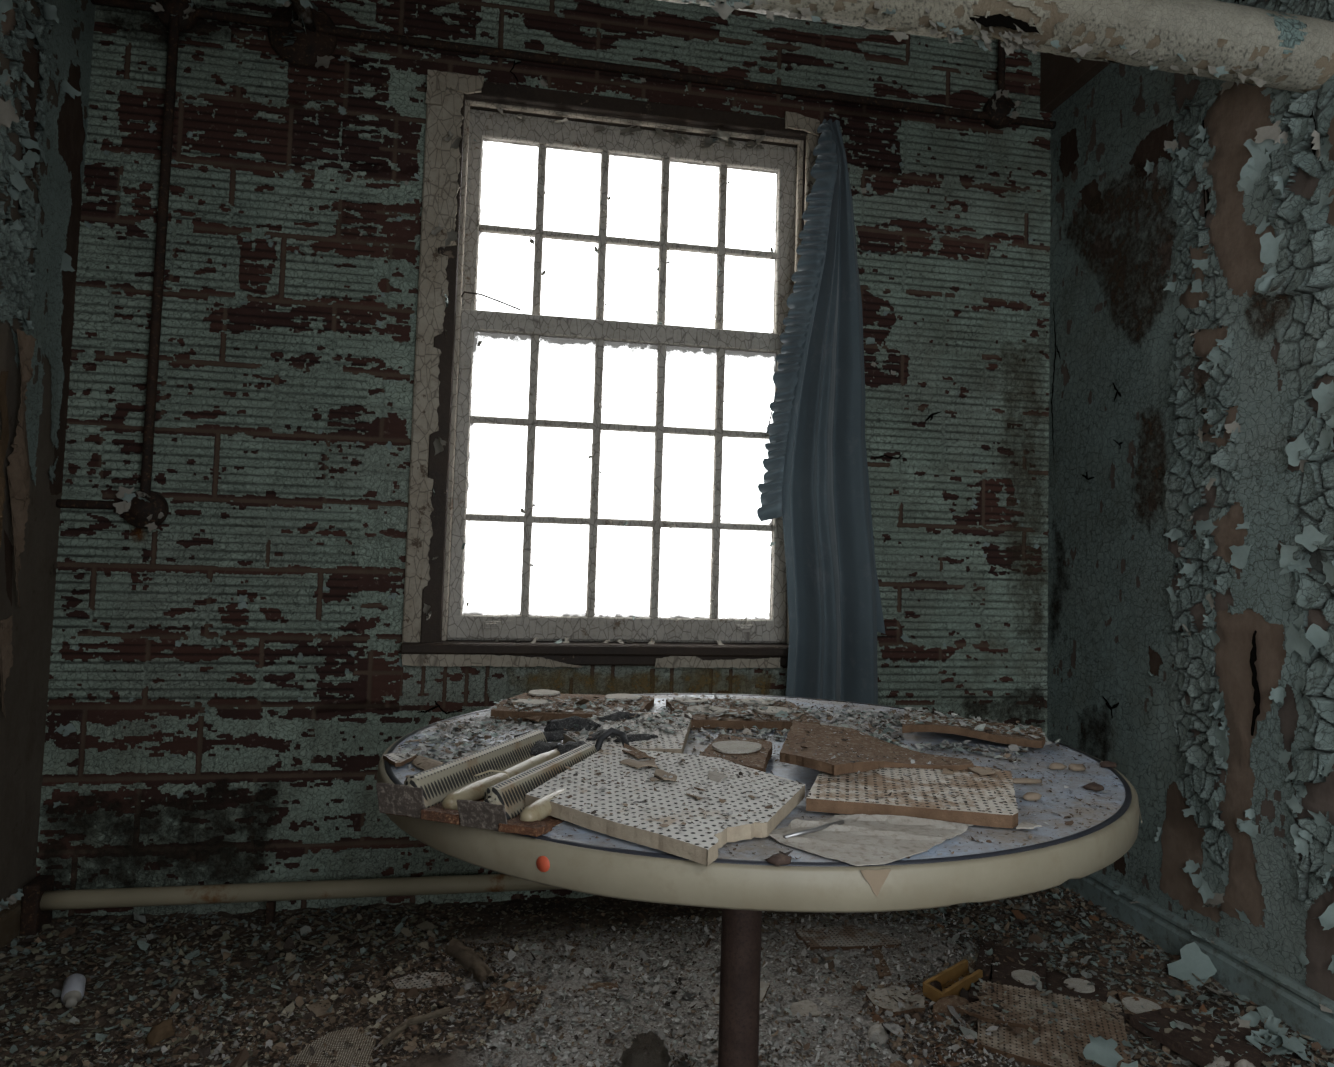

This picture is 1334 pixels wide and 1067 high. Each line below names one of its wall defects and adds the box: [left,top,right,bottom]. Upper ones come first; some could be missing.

flaking render [20,0,1033,495]
leakage [1065,163,1176,348]
crack [1202,120,1210,218]
peeling [1179,81,1282,309]
crack [1309,111,1317,155]
flaking render [321,564,405,604]
flaking render [952,478,1045,576]
flaking render [51,632,405,757]
peeling [401,694,1060,799]
peeling [1154,608,1334,928]
crack [1249,630,1260,736]
peeling [0,896,722,1067]